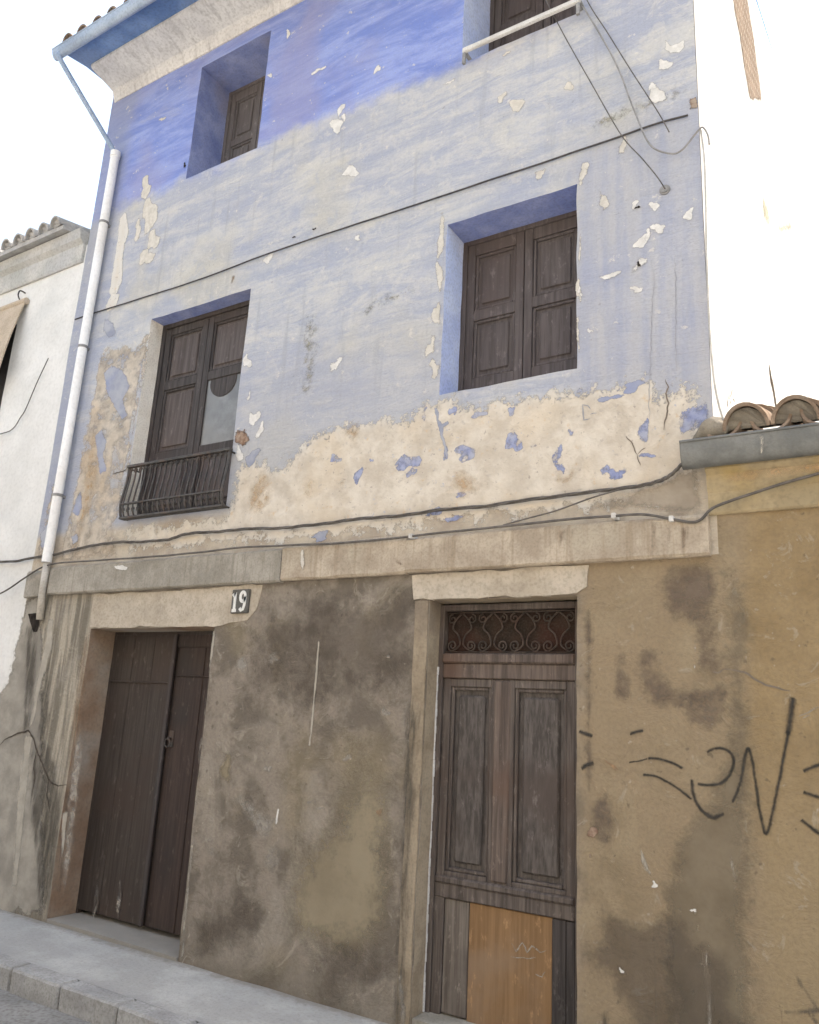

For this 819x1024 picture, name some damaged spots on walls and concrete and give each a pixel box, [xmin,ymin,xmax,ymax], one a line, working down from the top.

peeling [329,104,346,134]
peeling [648,82,667,103]
peeling [342,165,359,177]
peeling [62,175,708,570]
peeling [38,487,54,559]
damp [12,620,69,903]